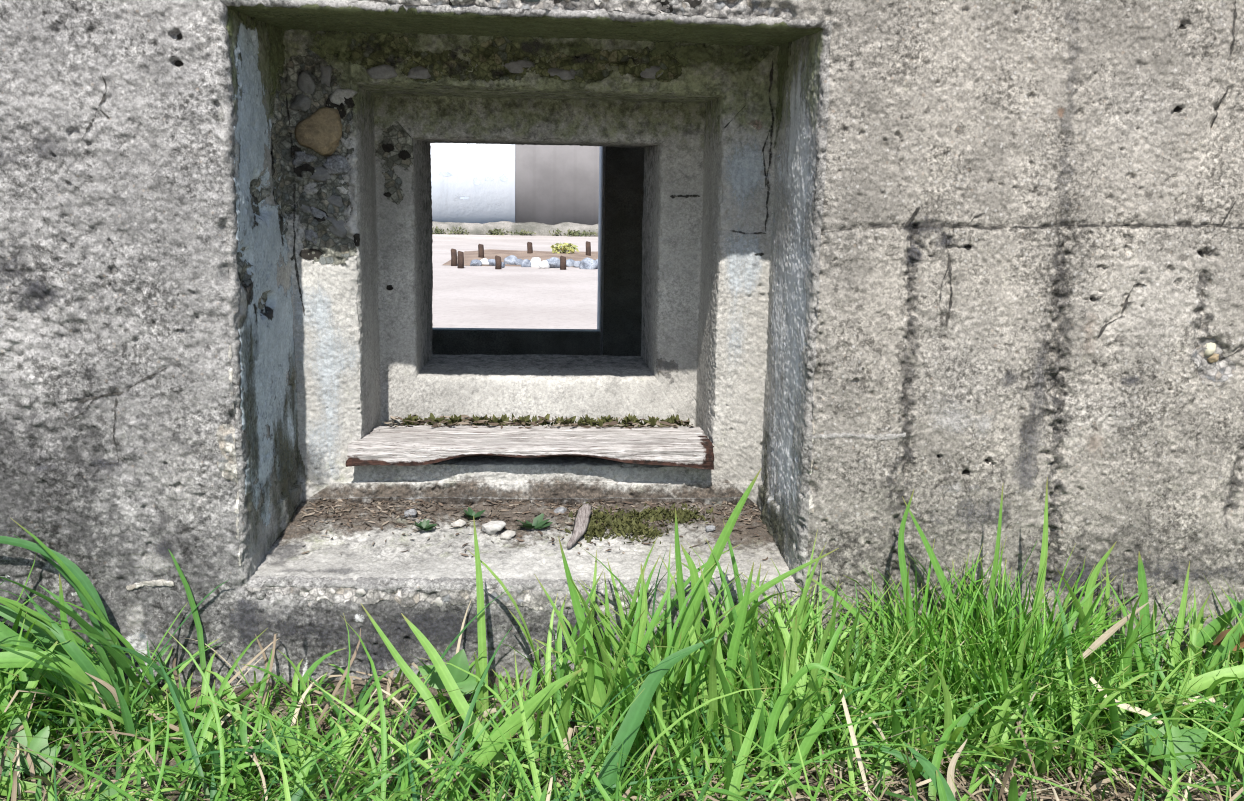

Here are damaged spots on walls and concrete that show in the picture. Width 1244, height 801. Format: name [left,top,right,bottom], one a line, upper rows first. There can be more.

water stain [226,7,285,113]
crack [724,60,774,256]
crack [1211,89,1228,128]
crack [1230,1,1238,56]
water stain [905,216,952,263]
peeling [216,23,682,566]